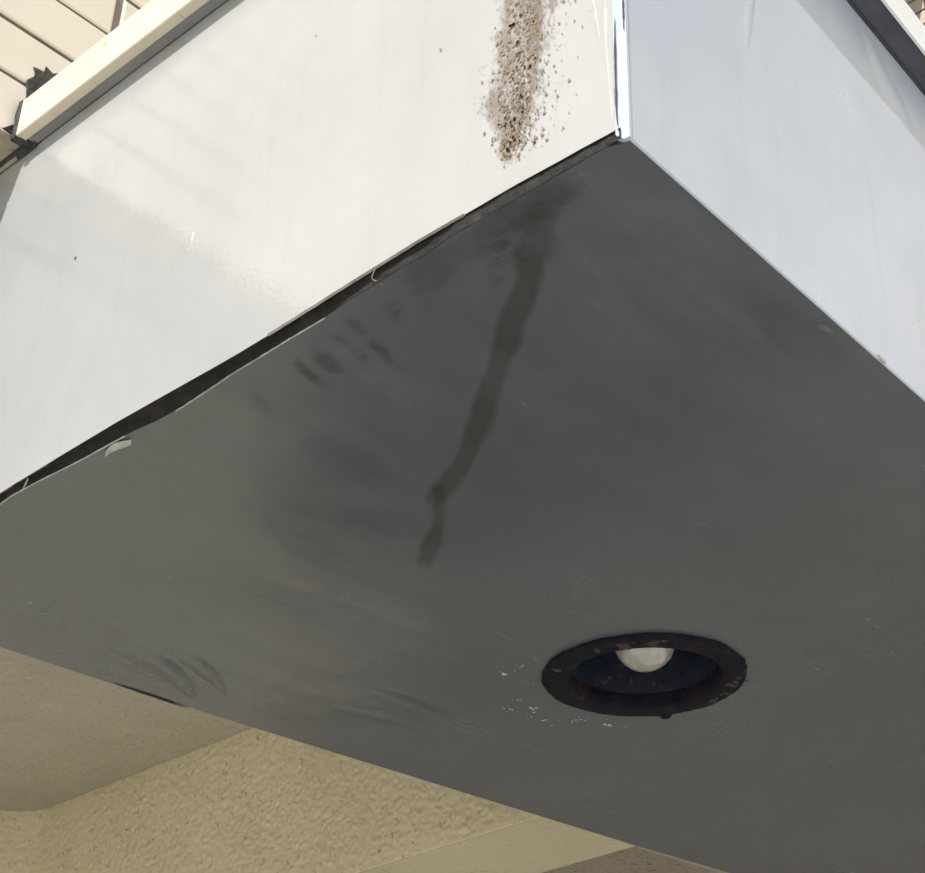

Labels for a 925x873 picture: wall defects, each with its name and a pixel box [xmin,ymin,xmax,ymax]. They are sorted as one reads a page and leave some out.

mould [474,0,583,168]